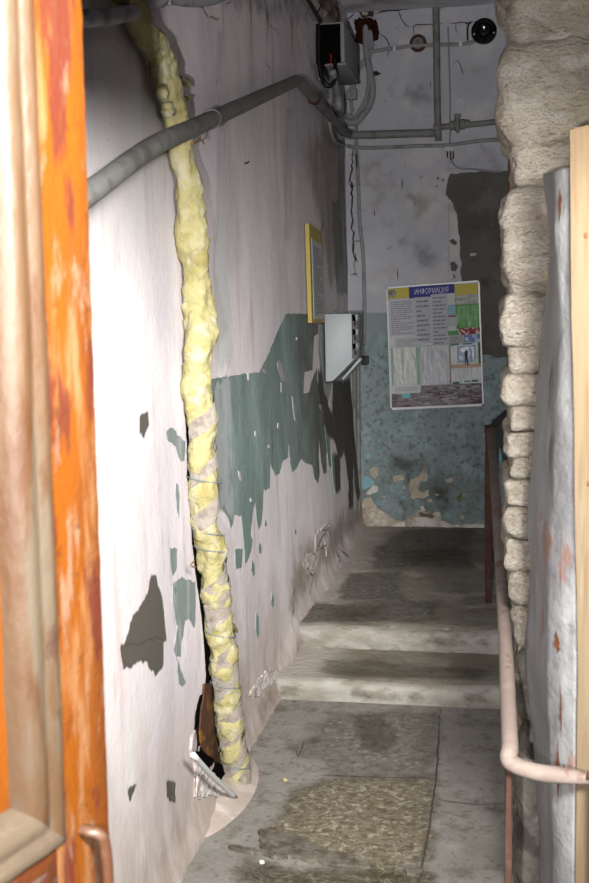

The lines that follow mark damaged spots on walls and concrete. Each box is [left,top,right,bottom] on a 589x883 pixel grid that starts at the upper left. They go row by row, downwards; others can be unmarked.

peeling [317,0,342,23]
spalling [351,11,380,45]
crack [321,149,360,311]
peeling [211,313,336,577]
spalling [361,453,484,528]
spalling [248,669,281,698]